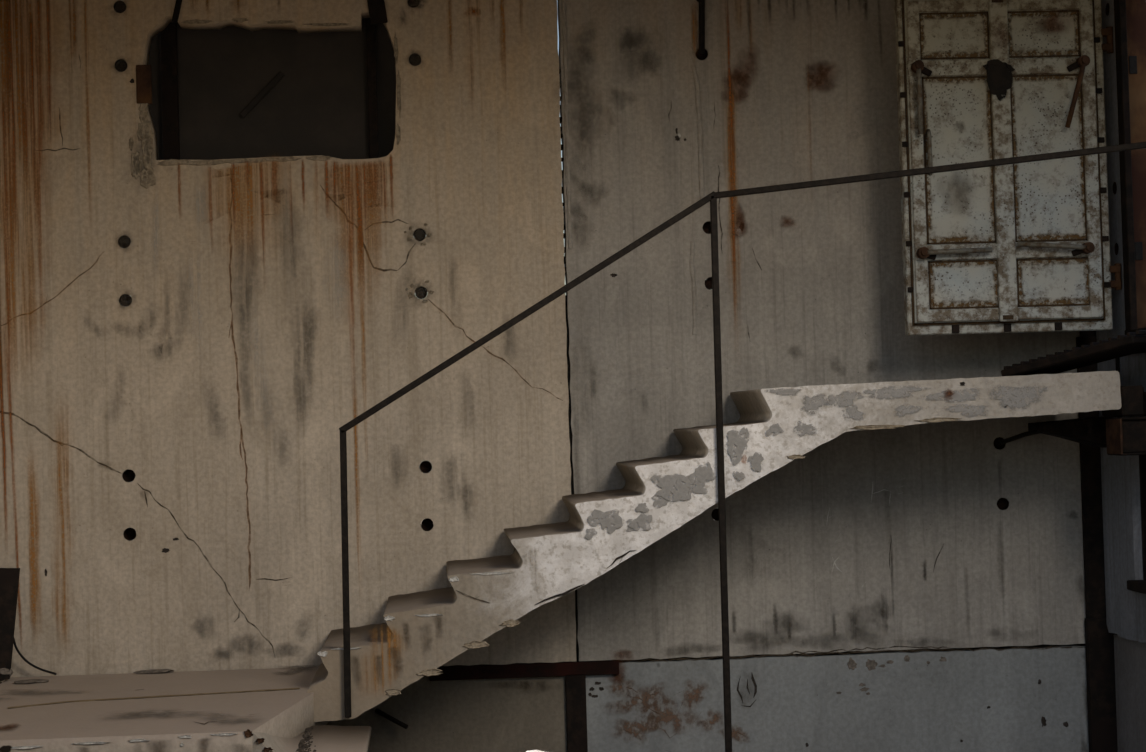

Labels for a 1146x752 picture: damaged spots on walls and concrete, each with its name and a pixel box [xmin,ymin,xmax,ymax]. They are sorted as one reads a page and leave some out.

crack [36,109,80,151]
spalling [129,103,332,189]
corrosion [727,6,754,282]
corrosion [325,156,393,362]
corrosion [0,0,50,627]
crack [428,299,563,401]
corrosion [56,449,68,631]
crack [0,164,288,648]
peeling [585,462,716,539]
peeling [727,428,764,481]
peeling [766,382,1047,437]
spalling [416,668,443,677]